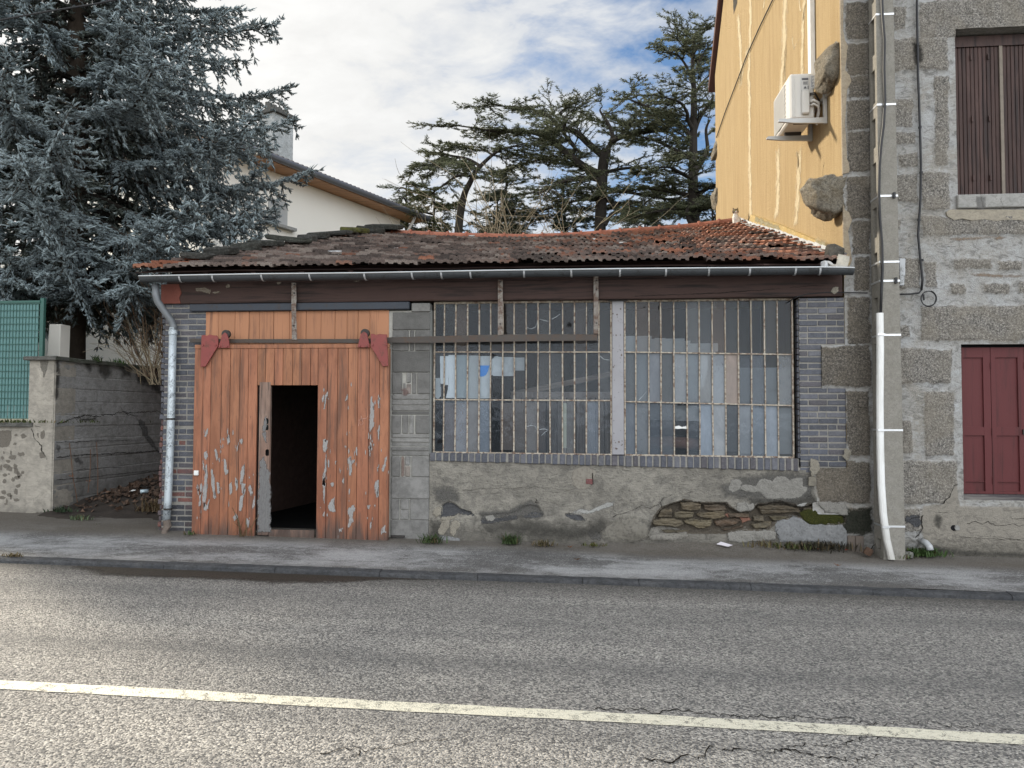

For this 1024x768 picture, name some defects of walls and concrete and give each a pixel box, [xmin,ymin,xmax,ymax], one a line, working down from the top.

peeling [0,430,45,505]
crack [31,411,159,480]
peeling [196,430,271,532]
peeling [320,395,389,535]
spalling [432,488,544,541]
peeling [565,502,613,521]
spalling [648,459,848,541]
crack [595,707,1022,764]